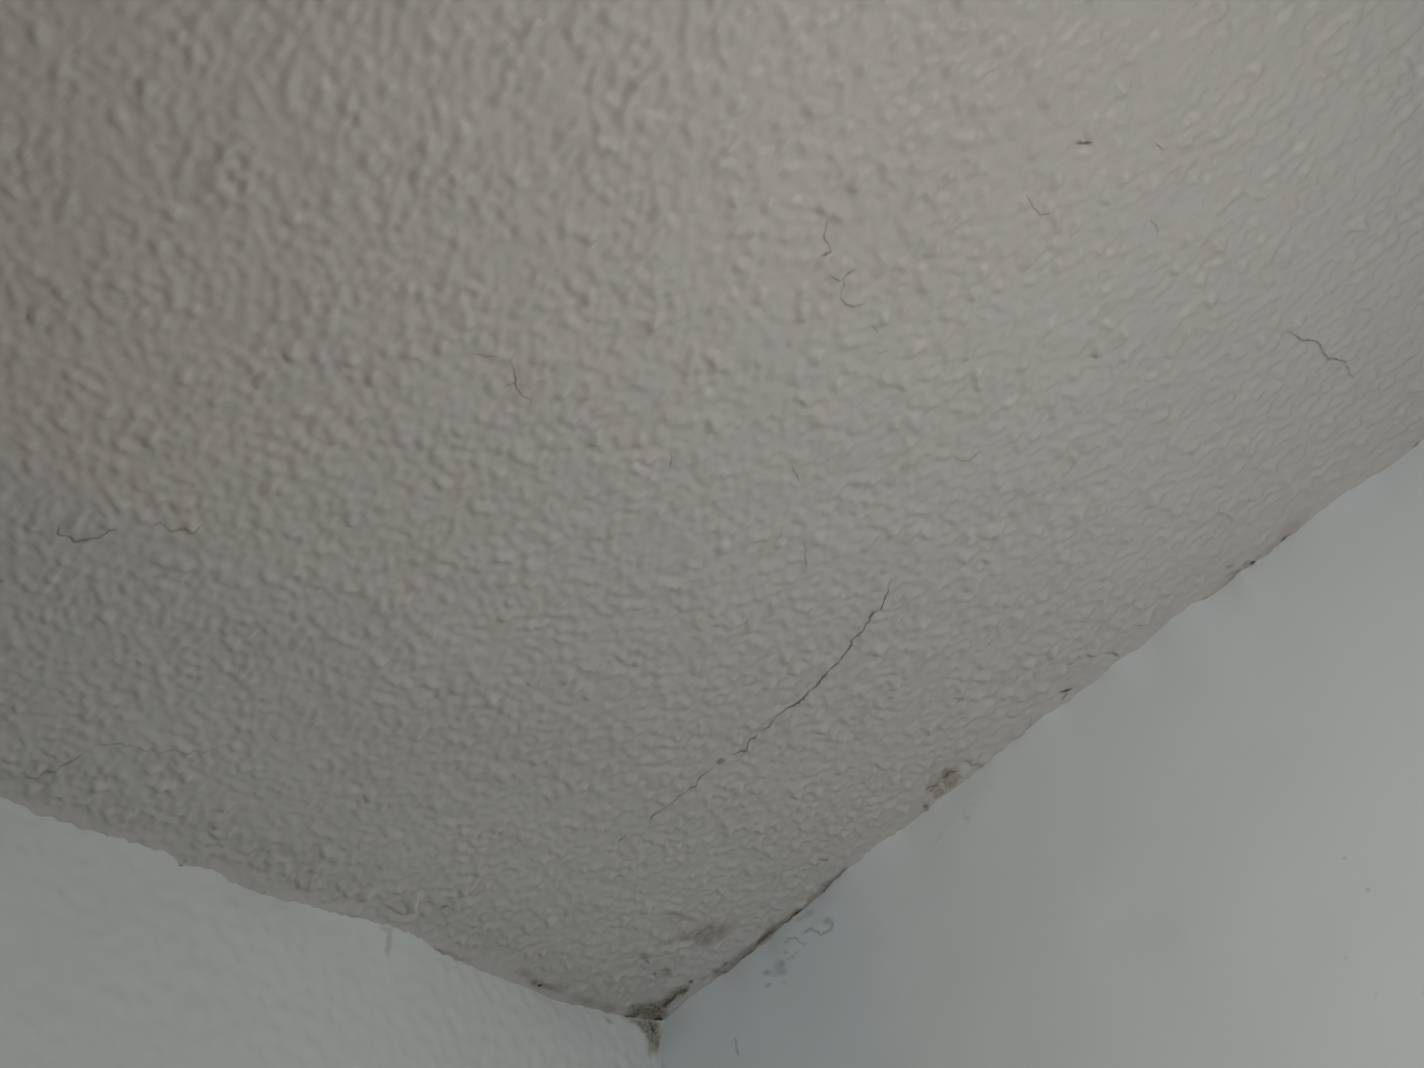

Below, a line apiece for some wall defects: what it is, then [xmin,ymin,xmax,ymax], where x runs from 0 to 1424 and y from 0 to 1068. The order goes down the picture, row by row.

crack [647,589,889,821]